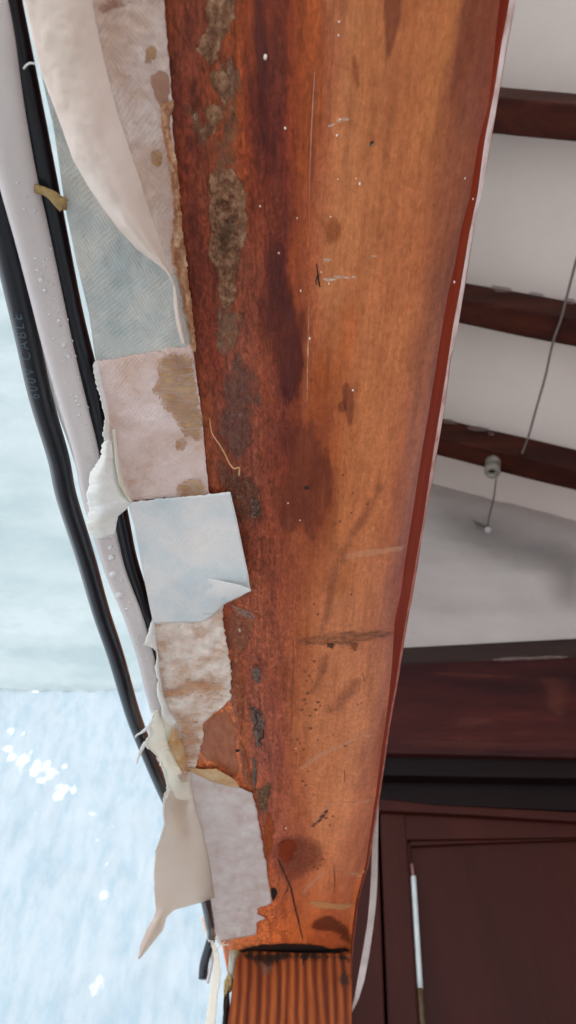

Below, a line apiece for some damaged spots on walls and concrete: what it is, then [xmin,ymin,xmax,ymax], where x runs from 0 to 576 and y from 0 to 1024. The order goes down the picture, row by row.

peeling [24,0,187,345]
peeling [228,607,254,656]
peeling [200,712,238,775]
spalling [249,707,271,812]
leakage [263,813,324,879]